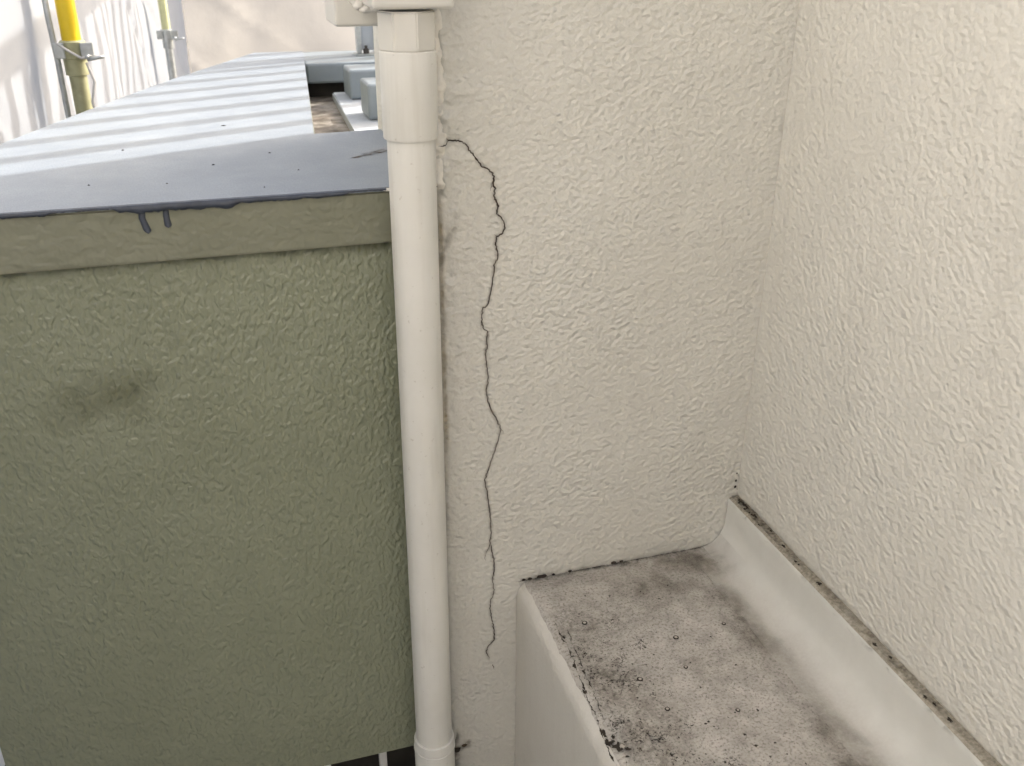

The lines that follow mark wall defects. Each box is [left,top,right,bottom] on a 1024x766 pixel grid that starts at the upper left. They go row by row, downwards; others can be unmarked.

crack [440,139,506,668]
mould [734,473,785,548]